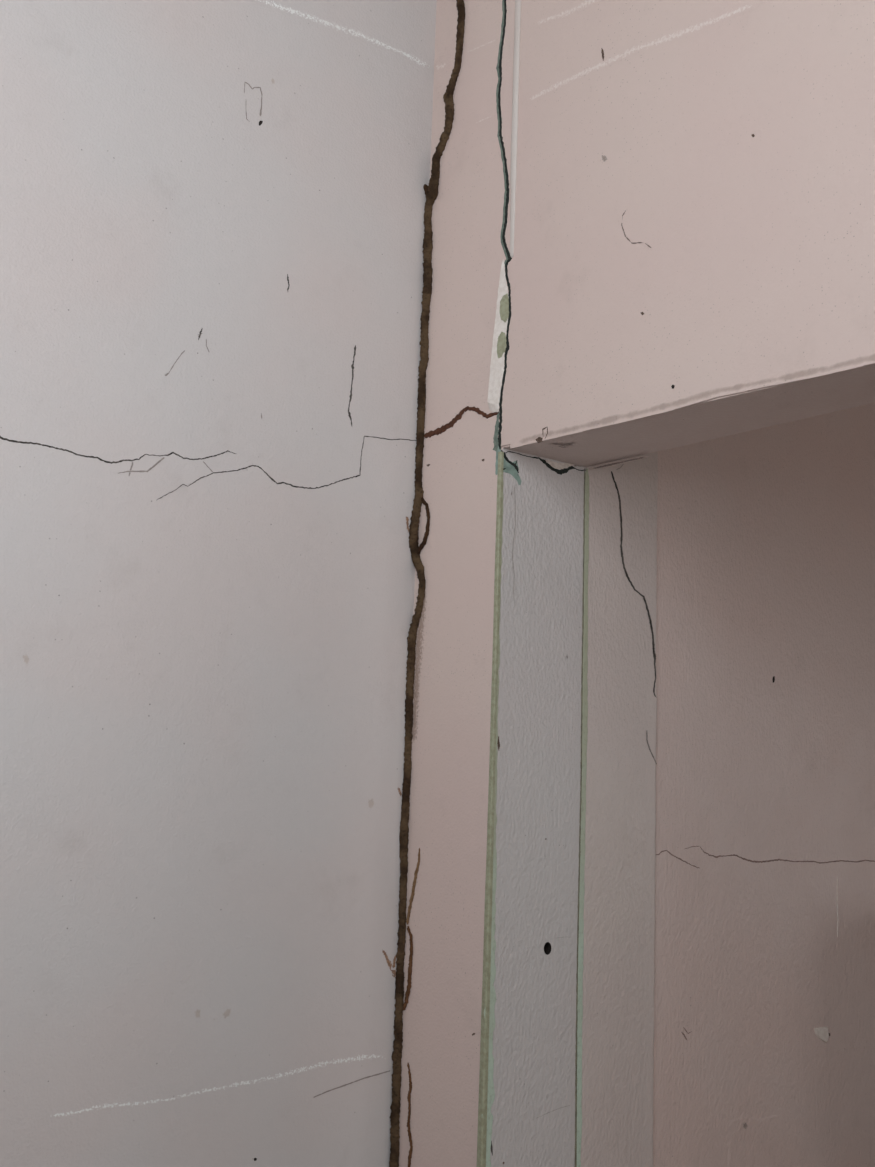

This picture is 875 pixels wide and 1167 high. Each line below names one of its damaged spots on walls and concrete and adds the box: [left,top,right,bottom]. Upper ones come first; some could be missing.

crack [163,329,210,377]
crack [0,345,417,500]
crack [493,0,657,698]
crack [656,846,875,868]